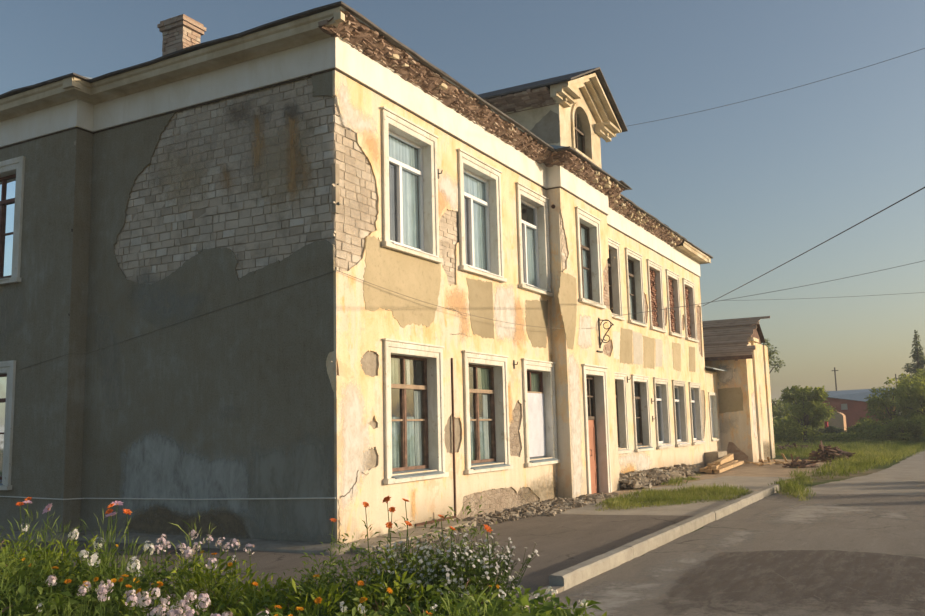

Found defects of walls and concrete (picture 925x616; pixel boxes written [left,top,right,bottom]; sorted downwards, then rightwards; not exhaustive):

spalling [530,110,560,144]
spalling [115,77,459,328]
peeling [466,277,494,339]
spalling [360,350,378,377]
damp [122,434,330,538]
crack [338,470,369,541]
damp [341,384,369,508]
spalling [362,447,377,471]
spalling [444,414,463,454]
spalling [457,486,539,519]
spalling [509,400,523,457]